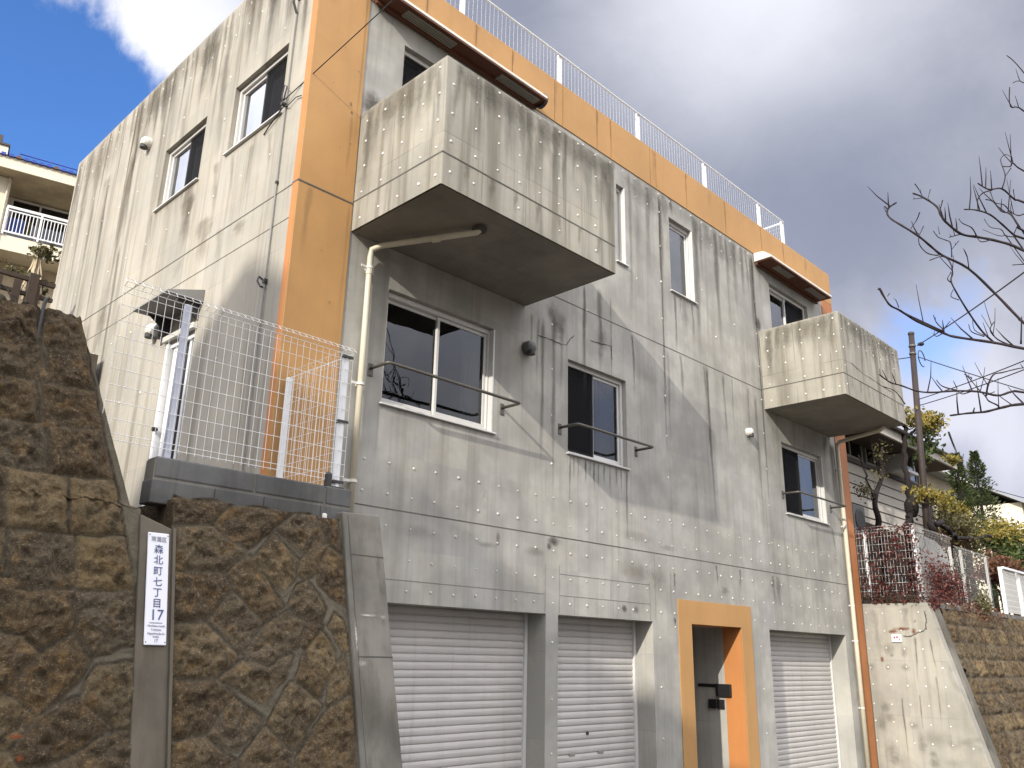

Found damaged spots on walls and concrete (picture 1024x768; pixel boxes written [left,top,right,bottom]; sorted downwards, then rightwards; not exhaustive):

damp [752,268,764,419]